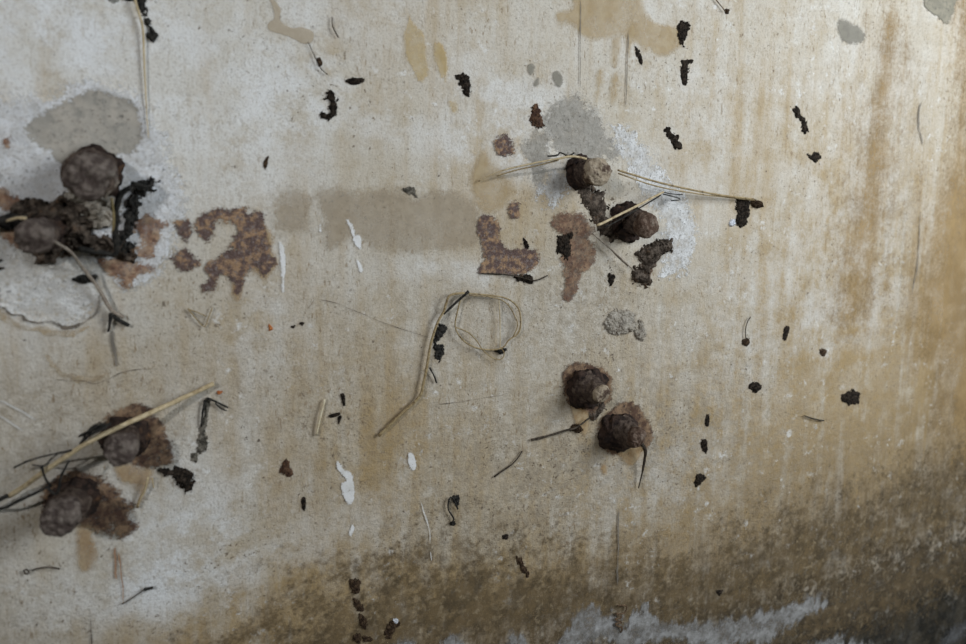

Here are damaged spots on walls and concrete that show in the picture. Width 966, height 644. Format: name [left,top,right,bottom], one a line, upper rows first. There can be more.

water stain [268,0,314,44]
water stain [557,0,679,105]
water stain [838,20,865,43]
peeling [924,0,958,24]
spalling [22,88,145,164]
corrosion [493,133,516,157]
spalling [0,232,112,336]
corrosion [98,206,278,297]
corrosion [476,199,541,276]
corrosion [551,209,596,302]
water stain [609,124,700,281]
water stain [219,151,966,644]